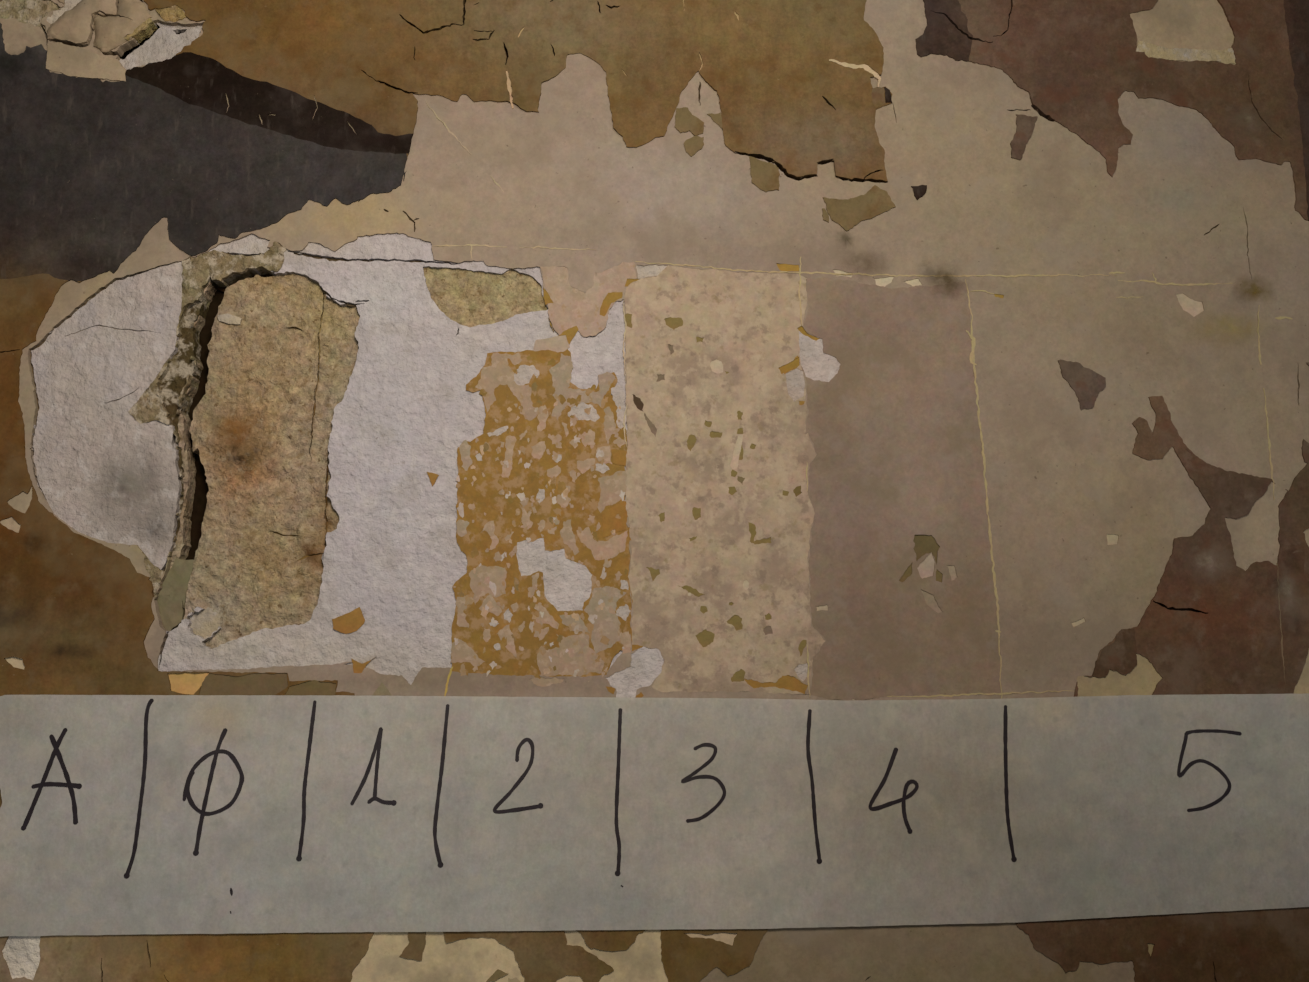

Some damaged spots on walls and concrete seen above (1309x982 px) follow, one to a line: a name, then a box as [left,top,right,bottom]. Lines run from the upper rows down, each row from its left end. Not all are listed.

crack [504,46,514,109]
crack [294,210,452,307]
peeling [0,0,1309,701]
crack [157,254,272,631]
peeling [351,932,525,982]
peeling [564,930,668,982]
peeling [685,932,737,946]
peeling [699,923,1135,982]